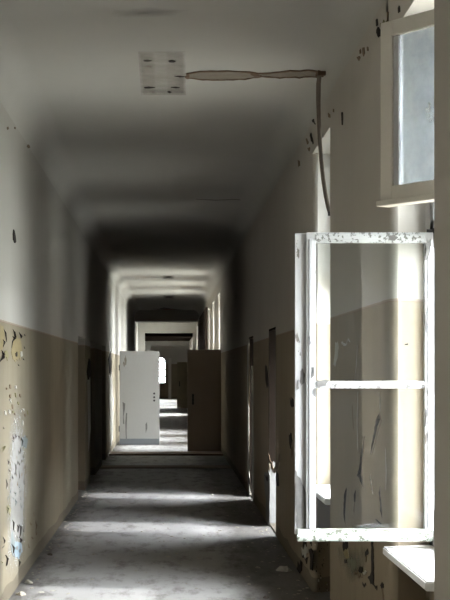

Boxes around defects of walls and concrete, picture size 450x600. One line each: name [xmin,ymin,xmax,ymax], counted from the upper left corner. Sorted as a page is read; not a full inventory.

peeling [0,324,25,366]
peeling [1,434,38,566]
peeling [297,542,328,593]